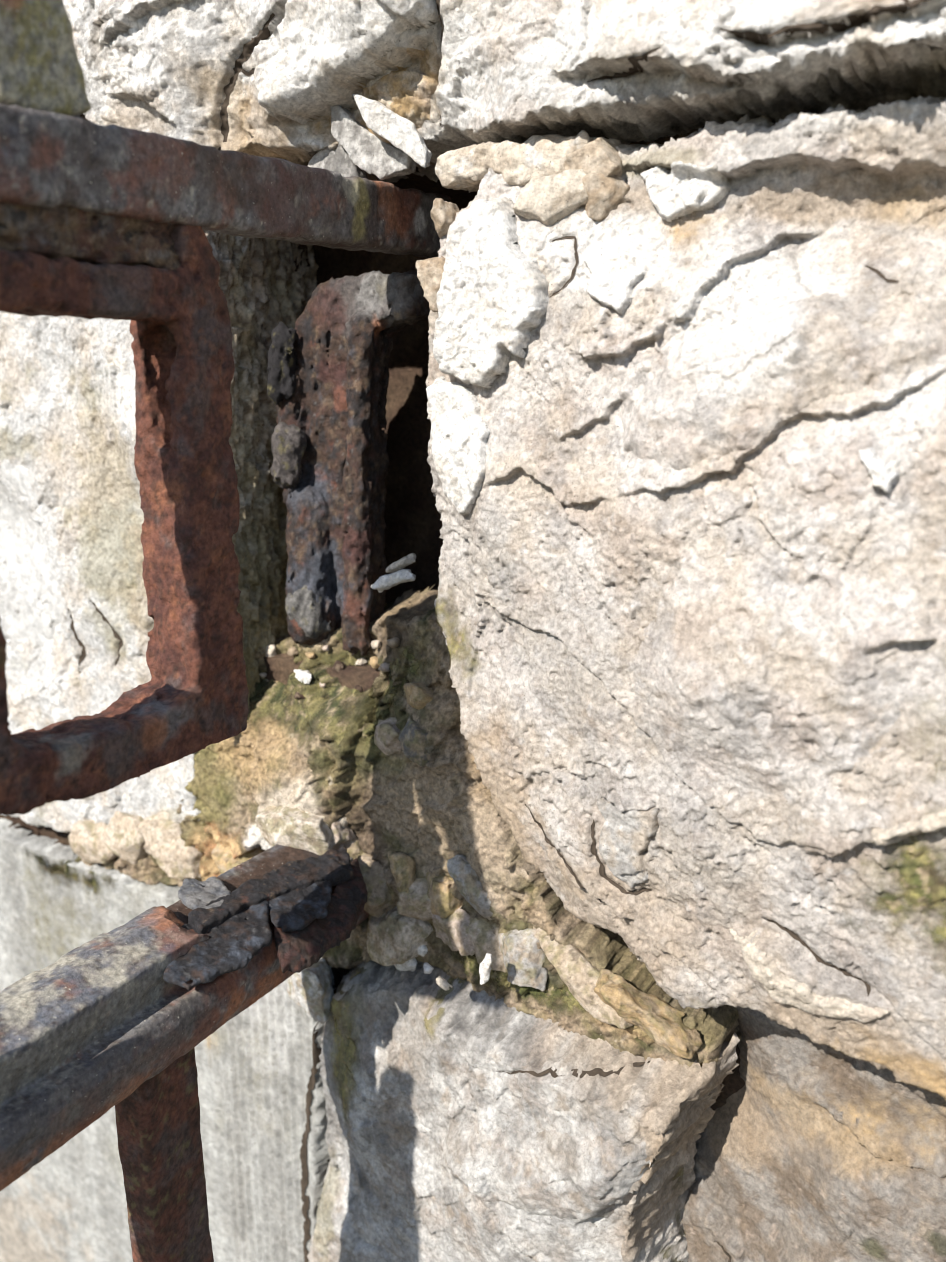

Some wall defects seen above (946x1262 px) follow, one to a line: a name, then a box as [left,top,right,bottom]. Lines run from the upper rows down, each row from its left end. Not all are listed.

crack [436,0,444,53]
crack [218,13,275,151]
corrosion [190,823,244,881]
crack [496,1060,651,1078]